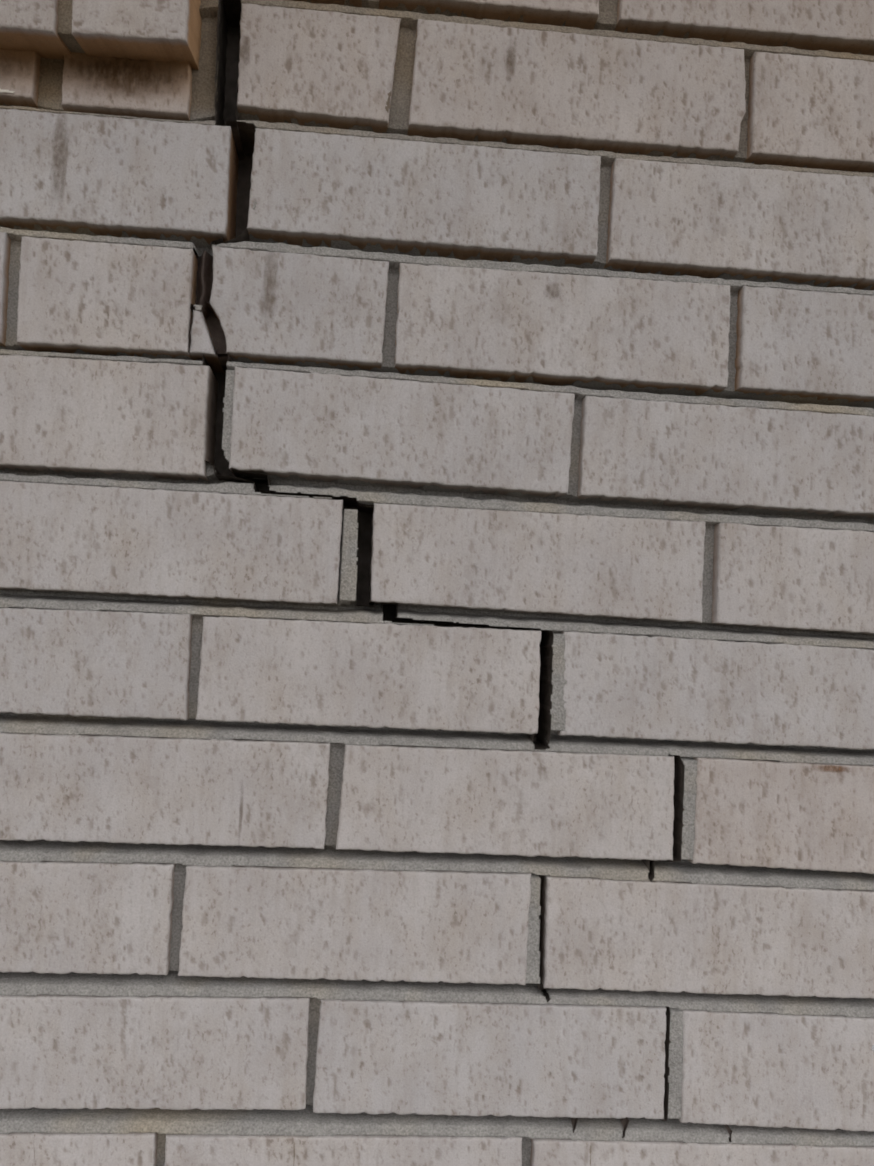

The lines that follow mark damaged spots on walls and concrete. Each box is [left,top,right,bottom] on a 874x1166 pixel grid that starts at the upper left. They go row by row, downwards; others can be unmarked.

crack [210,0,256,250]
crack [188,301,554,750]
crack [642,755,684,880]
crack [537,976,550,1002]